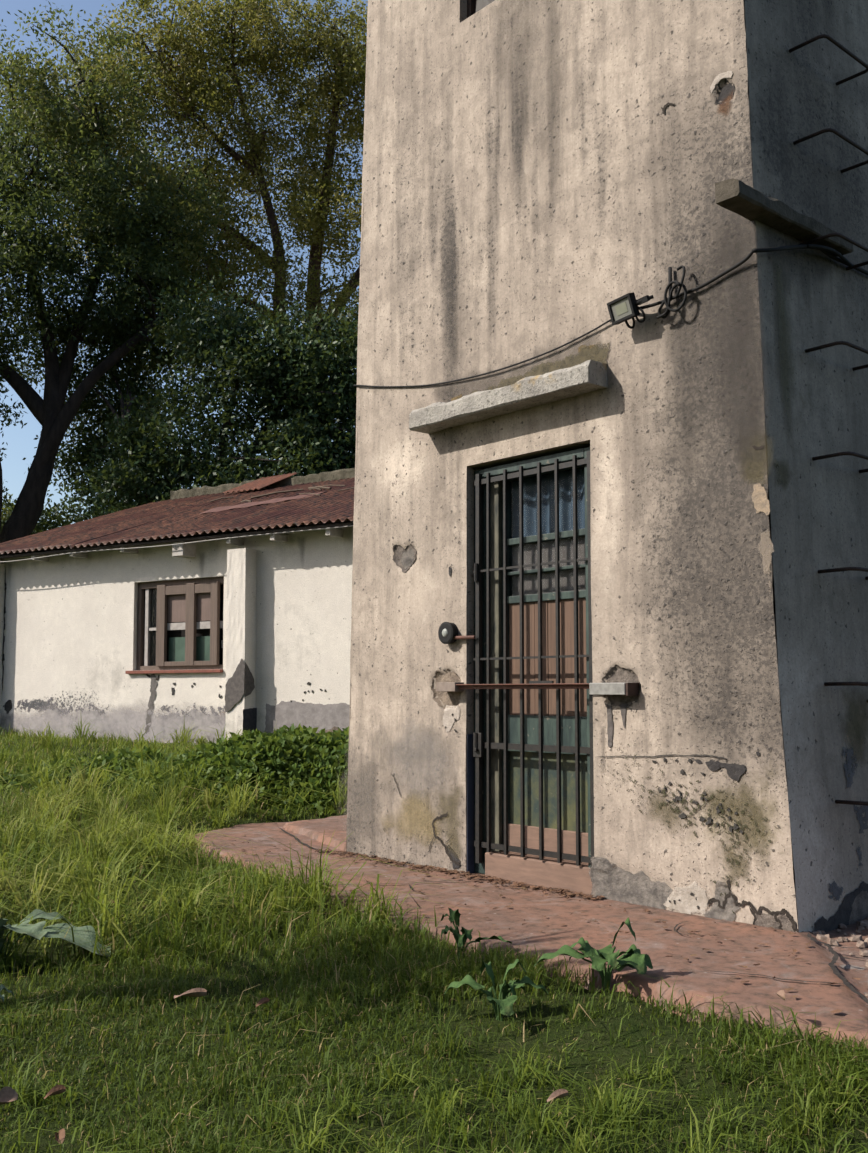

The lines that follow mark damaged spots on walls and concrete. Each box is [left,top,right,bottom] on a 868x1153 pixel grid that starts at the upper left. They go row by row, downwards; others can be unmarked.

spalling [393,544,417,572]
peeling [3,697,109,716]
peeling [161,659,350,733]
peeling [589,665,779,921]
crack [429,812,460,869]
spalling [814,881,868,932]